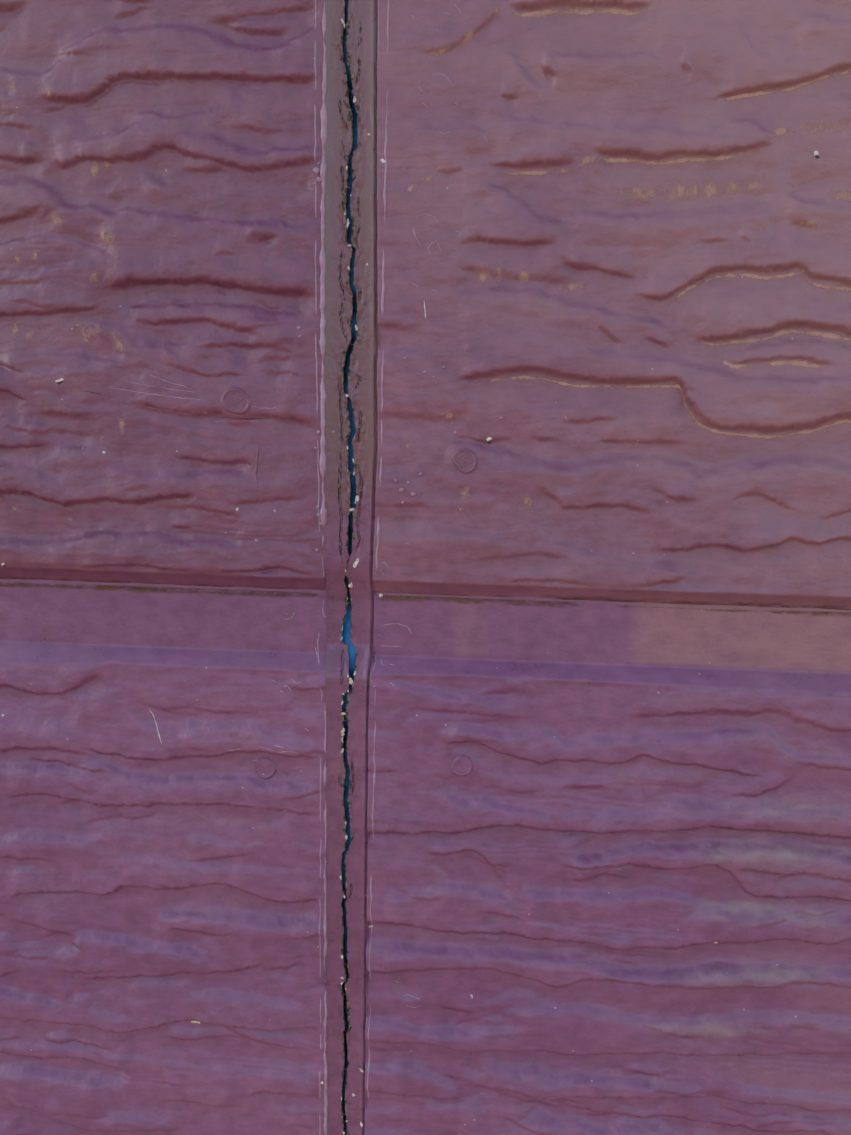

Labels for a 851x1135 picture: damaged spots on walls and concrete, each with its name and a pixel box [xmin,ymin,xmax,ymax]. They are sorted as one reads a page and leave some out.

crack [337,0,363,1135]